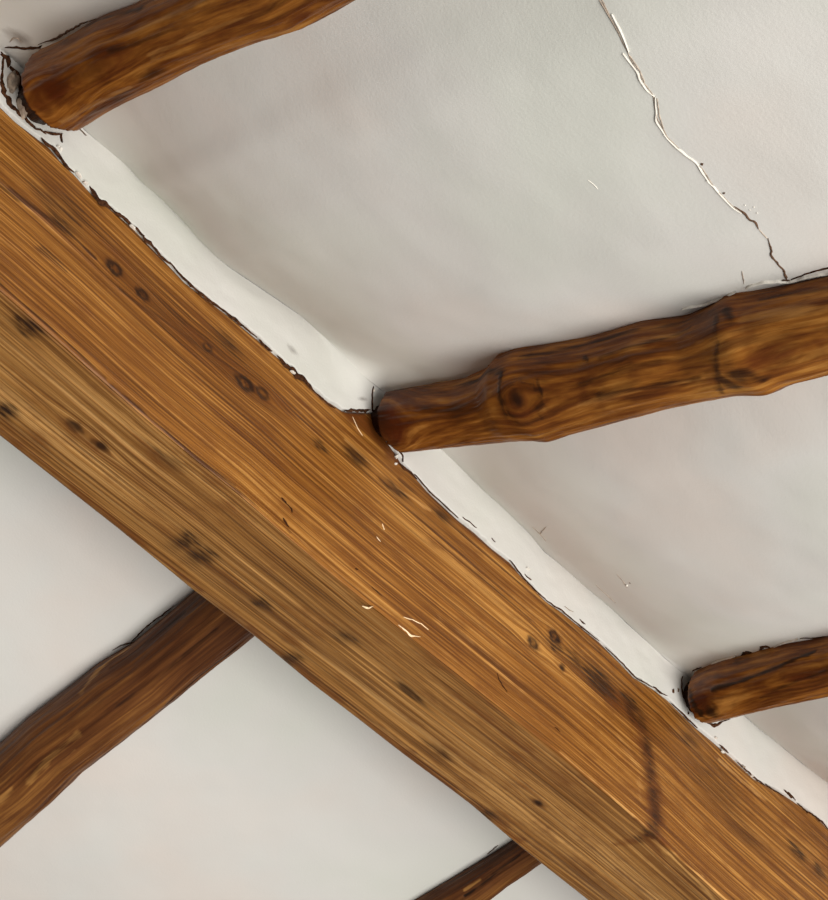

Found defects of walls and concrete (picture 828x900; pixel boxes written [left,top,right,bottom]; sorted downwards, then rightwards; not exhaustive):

crack [0,19,375,413]
crack [599,0,828,310]
crack [394,451,495,542]
crack [509,560,828,829]